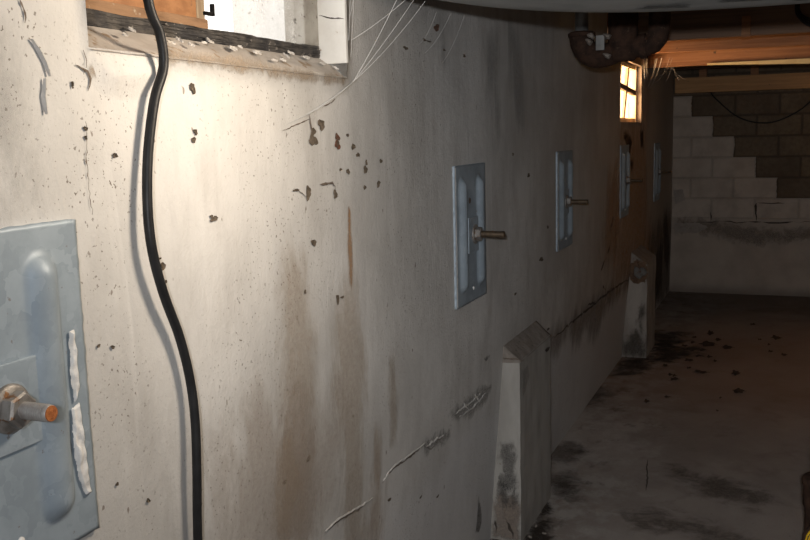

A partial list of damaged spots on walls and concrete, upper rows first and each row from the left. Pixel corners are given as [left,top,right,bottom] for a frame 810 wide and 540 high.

crack [696,202,809,224]
damp [616,308,697,375]
crack [325,437,442,531]